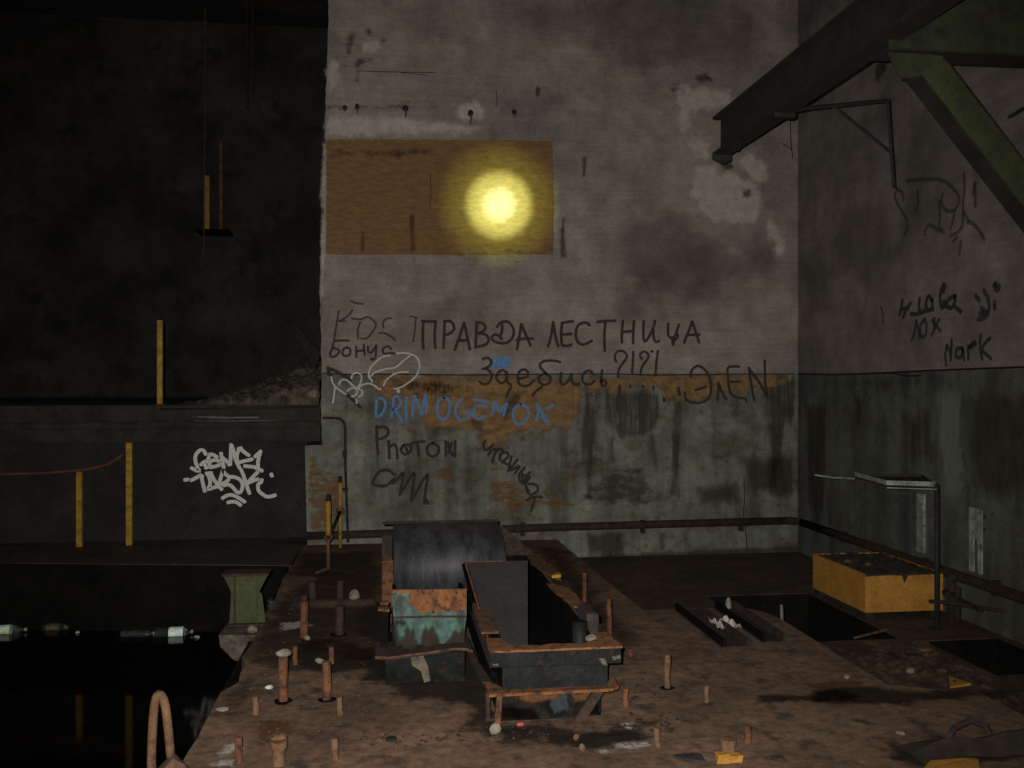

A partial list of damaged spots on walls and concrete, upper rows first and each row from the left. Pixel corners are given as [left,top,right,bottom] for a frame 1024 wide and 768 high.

water stain [582,389,681,503]